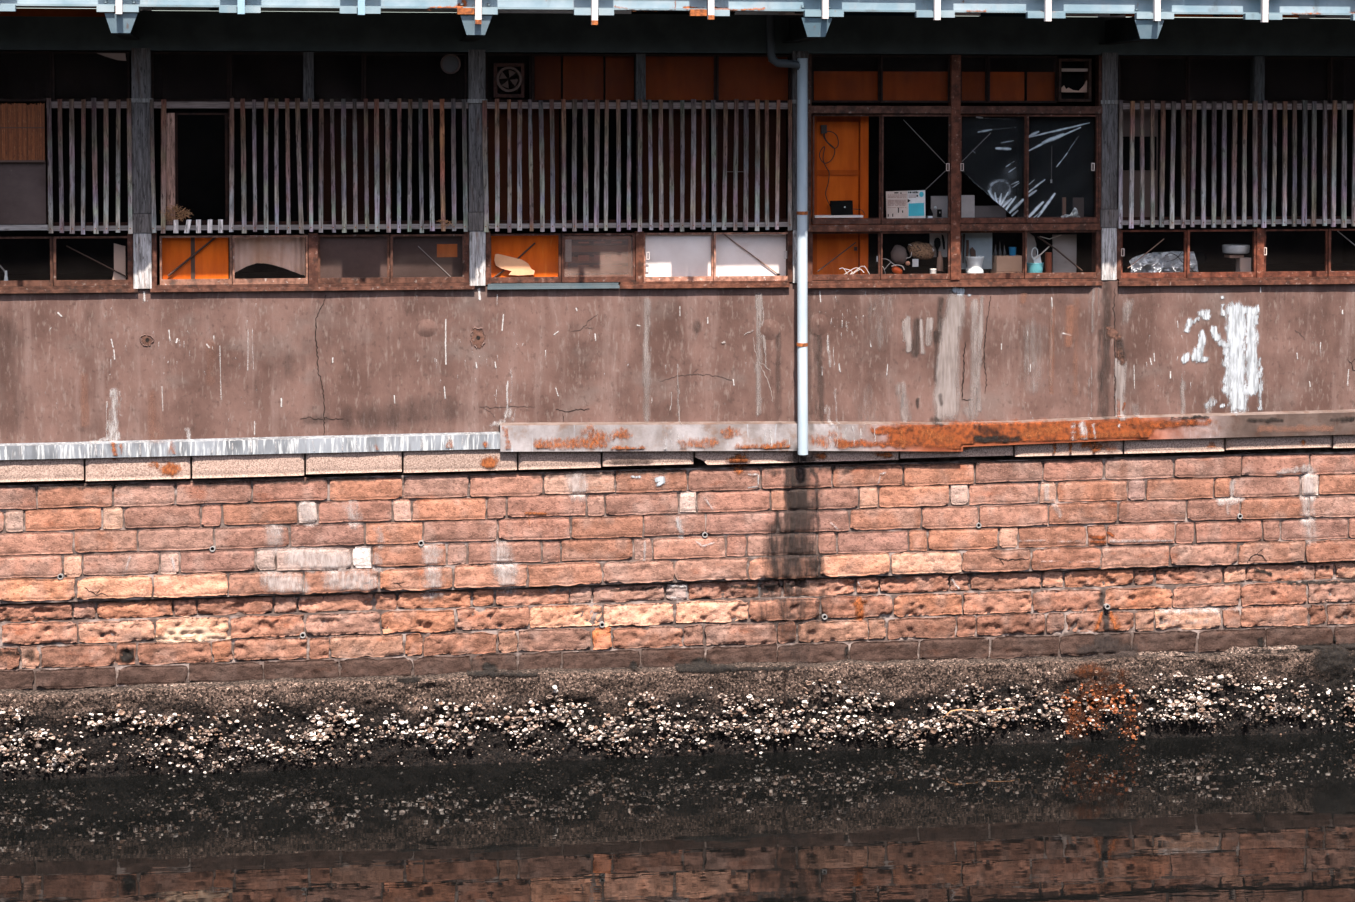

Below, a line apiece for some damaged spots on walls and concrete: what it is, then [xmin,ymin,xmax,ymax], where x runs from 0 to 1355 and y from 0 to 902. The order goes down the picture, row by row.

water stain [817,325,841,384]
water stain [1072,284,1124,440]
peeling [1181,296,1263,413]
rust [150,444,181,476]
water stain [195,477,376,485]
rust [534,426,645,452]
rust [678,426,790,474]
rust [812,400,1211,460]
water stain [748,447,1114,635]